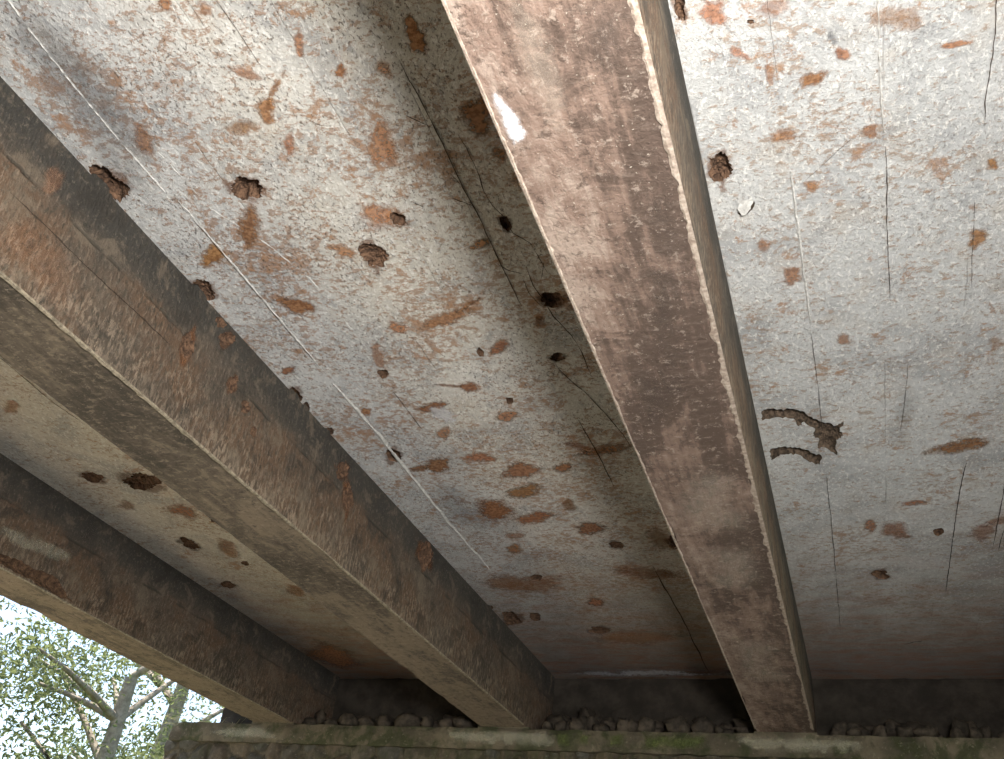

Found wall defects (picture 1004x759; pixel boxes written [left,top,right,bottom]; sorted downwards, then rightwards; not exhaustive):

corrosion [700,0,724,25]
corrosion [800,71,826,86]
crack [984,0,997,128]
corrosion [460,94,505,161]
spalling [230,176,264,200]
spalling [708,151,733,182]
crack [883,146,891,290]
spalling [358,243,389,267]
crack [401,64,630,488]
spalling [761,408,844,465]
corrosion [477,462,553,553]
crack [945,463,967,597]